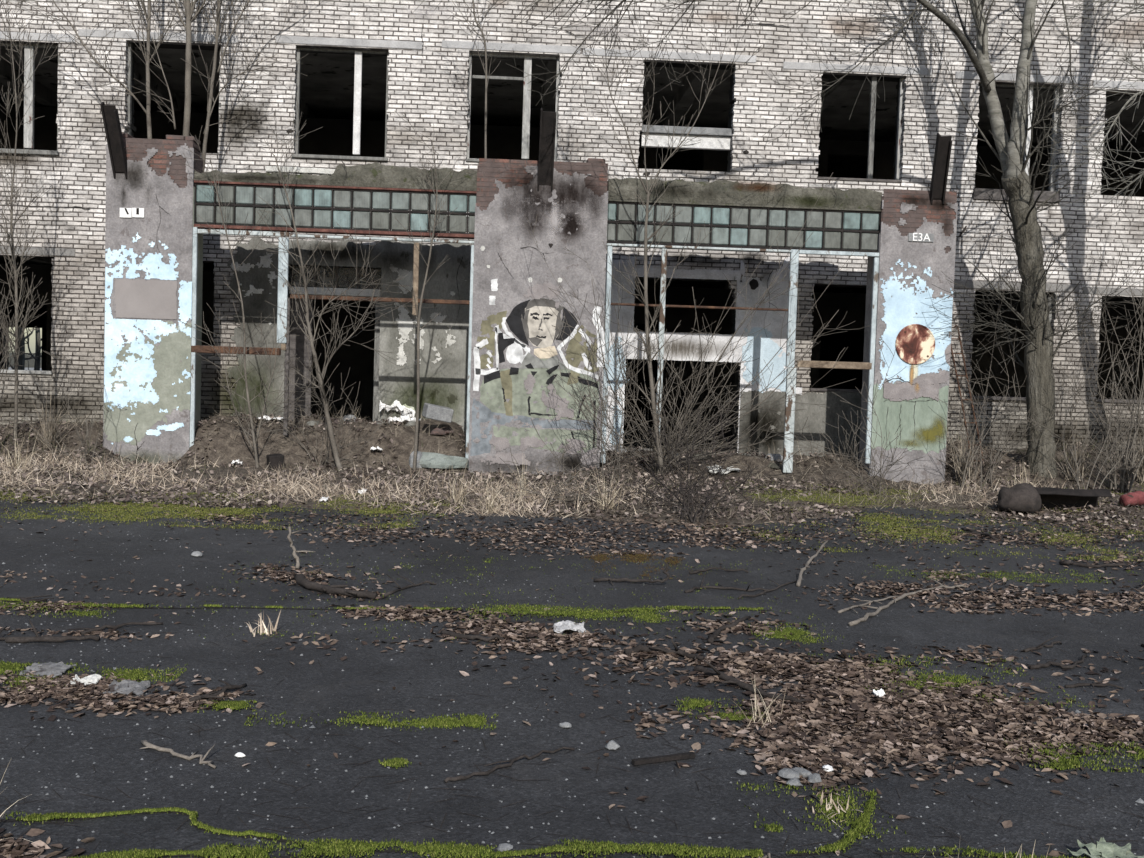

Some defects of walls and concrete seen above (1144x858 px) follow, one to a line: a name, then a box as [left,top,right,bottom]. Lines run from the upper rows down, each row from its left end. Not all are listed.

spalling [123,138,193,188]
spalling [478,158,538,211]
water stain [523,178,590,237]
spalling [554,161,608,197]
spalling [882,189,967,254]
peeling [104,232,192,445]
peeling [390,264,456,366]
peeling [871,259,953,454]